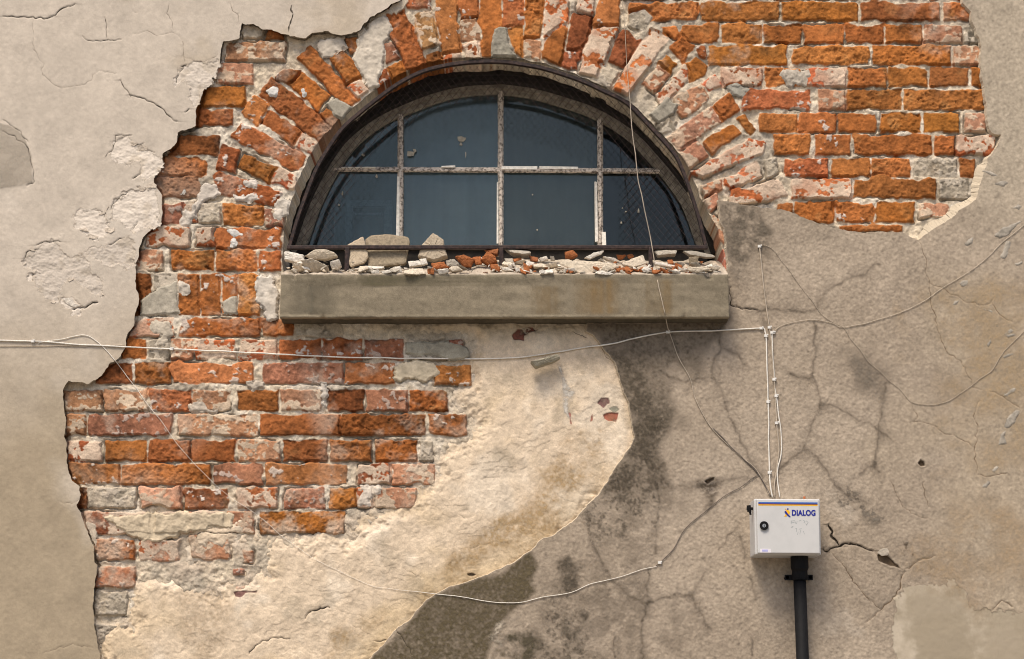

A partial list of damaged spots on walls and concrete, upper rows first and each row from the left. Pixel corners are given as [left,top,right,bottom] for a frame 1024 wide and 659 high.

spalling [608,0,998,239]
spalling [707,218,726,269]
spalling [22,24,634,659]
leakage [591,323,725,535]
leakage [373,553,587,659]
crack [823,525,933,611]
spalling [889,578,1024,659]